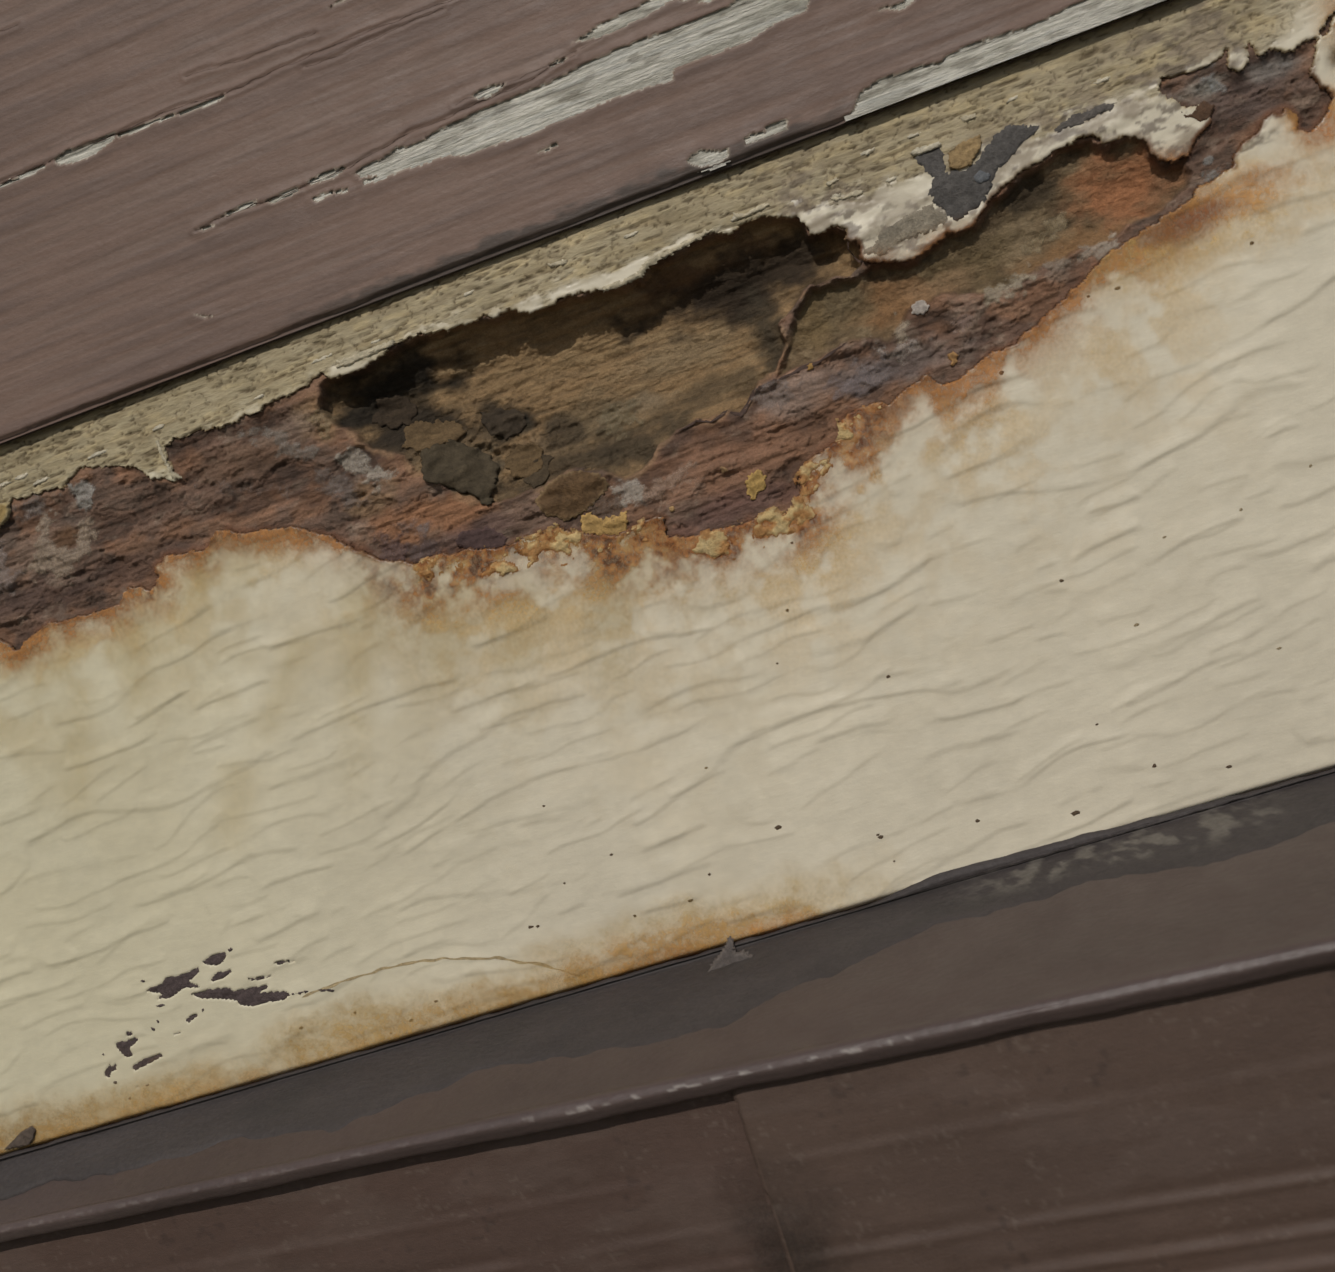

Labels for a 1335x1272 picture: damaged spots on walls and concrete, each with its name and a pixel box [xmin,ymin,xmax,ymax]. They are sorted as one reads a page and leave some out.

peeling [844,0,1164,121]
peeling [227,0,809,215]
peeling [1181,101,1215,122]
peeling [0,95,224,188]
peeling [907,102,1117,221]
water stain [863,203,948,256]
peeling [911,300,930,315]
peeling [455,526,507,550]
peeling [580,510,629,536]
peeling [141,948,334,1034]
water stain [302,956,588,998]
peeling [102,1031,163,1084]